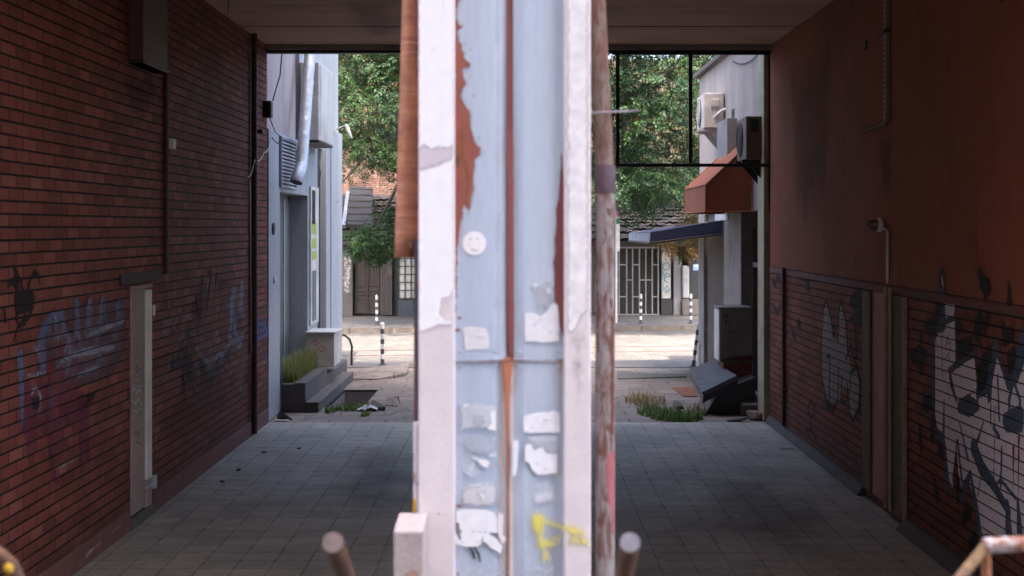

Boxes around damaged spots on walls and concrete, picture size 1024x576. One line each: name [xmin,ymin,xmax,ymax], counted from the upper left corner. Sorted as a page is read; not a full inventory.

rust [466,0,562,572]
rust [553,154,564,336]
rust [595,202,615,434]